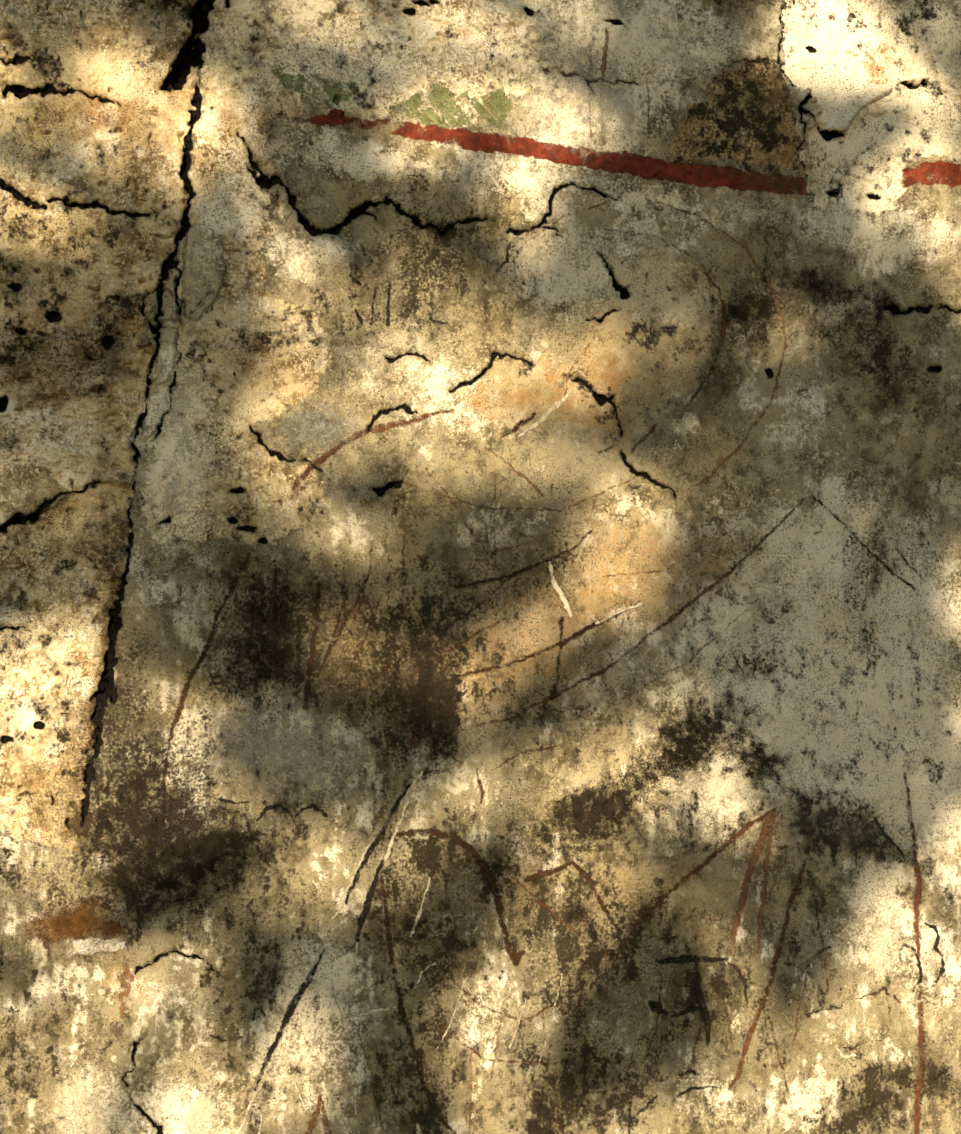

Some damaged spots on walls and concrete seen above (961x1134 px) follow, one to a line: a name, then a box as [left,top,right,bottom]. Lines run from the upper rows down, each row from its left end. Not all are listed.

crack [723,0,845,188]
spalling [665,0,961,216]
crack [0,0,230,826]
spalling [0,0,547,856]
crack [367,404,418,432]
crack [237,133,618,393]
spalling [456,248,722,448]
crack [572,378,677,500]
damp [705,295,773,398]
mould [794,267,895,390]
damp [144,753,168,790]
damp [790,792,936,876]